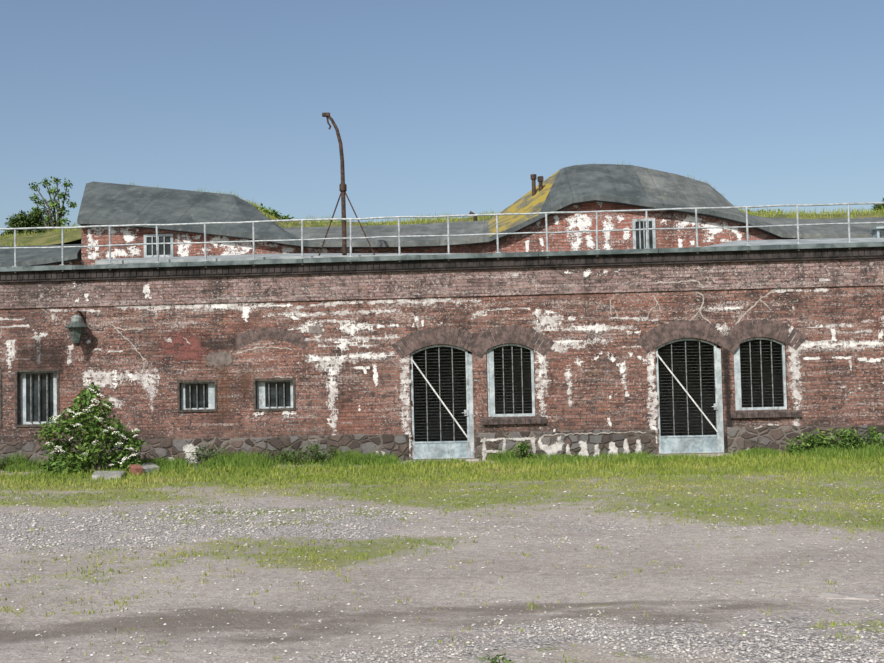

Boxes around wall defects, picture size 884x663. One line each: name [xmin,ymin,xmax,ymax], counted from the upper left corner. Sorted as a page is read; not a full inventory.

peeling [86,229,142,260]
peeling [289,325,323,334]
peeling [334,327,369,351]